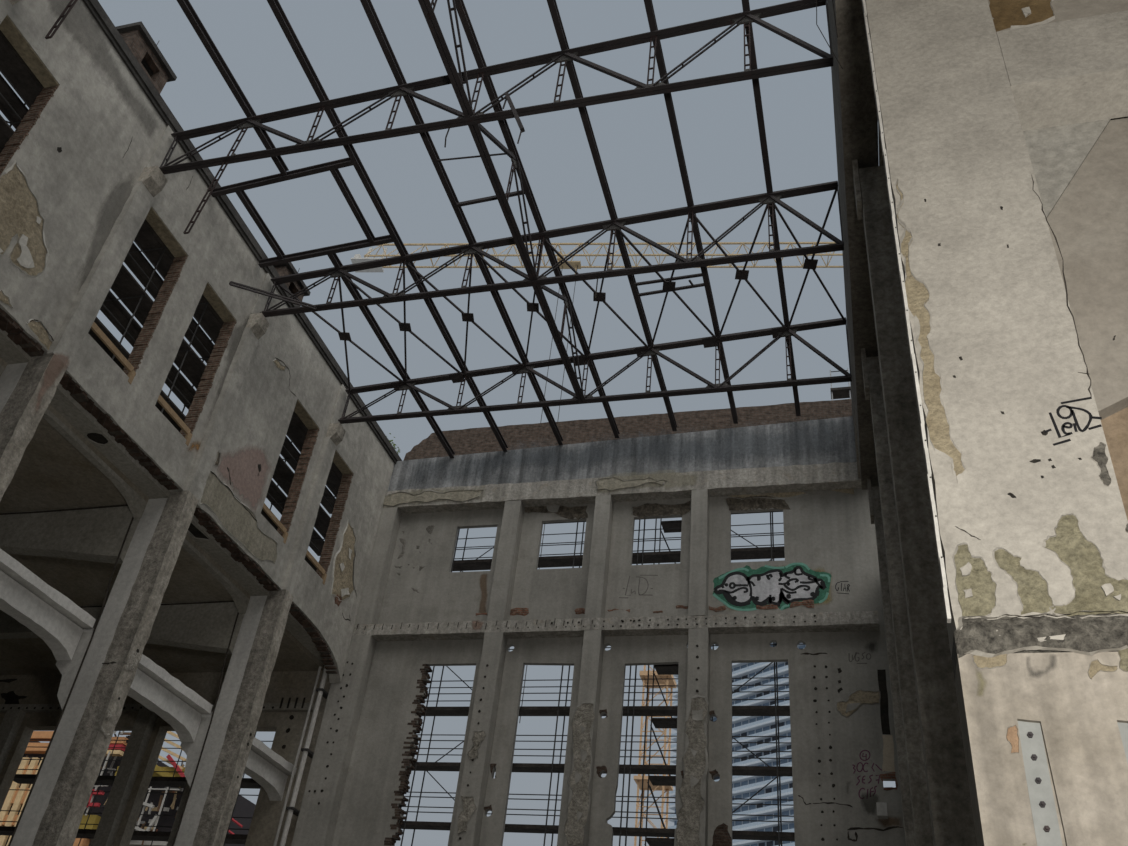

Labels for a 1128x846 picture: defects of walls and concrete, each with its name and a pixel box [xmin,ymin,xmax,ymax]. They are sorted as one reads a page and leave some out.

flaking render [989,0,1055,32]
flaking render [0,161,49,278]
spalling [896,179,968,484]
leakage [418,423,836,477]
spalling [1078,442,1111,487]
spalling [194,507,279,591]
flaking render [331,520,595,630]
spalling [952,514,1128,680]